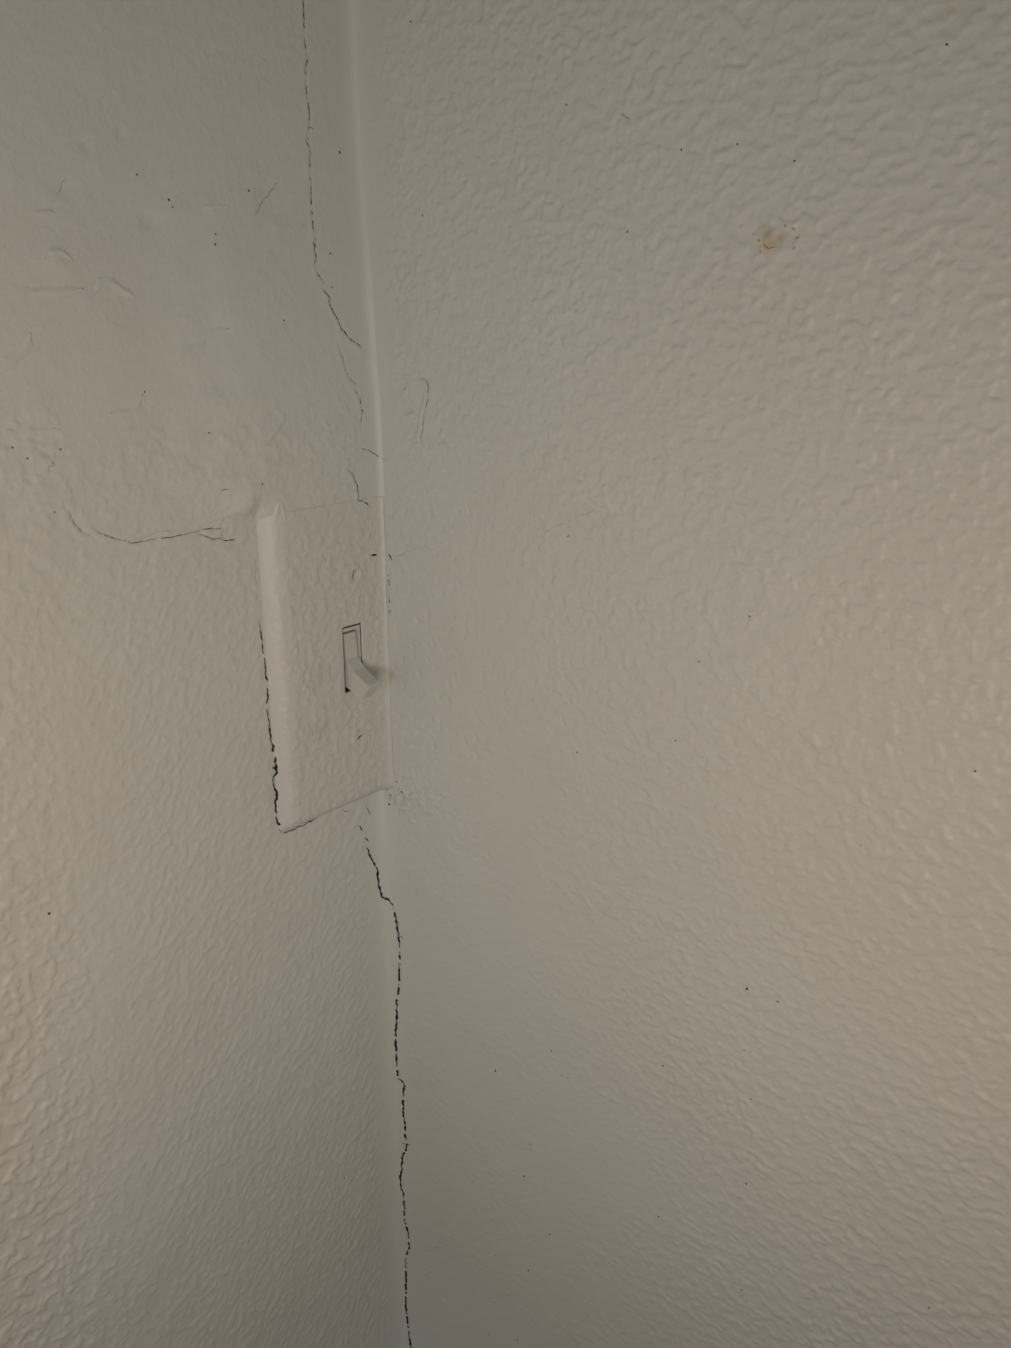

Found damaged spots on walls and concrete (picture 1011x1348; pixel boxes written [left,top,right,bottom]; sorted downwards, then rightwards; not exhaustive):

crack [68,510,418,1348]